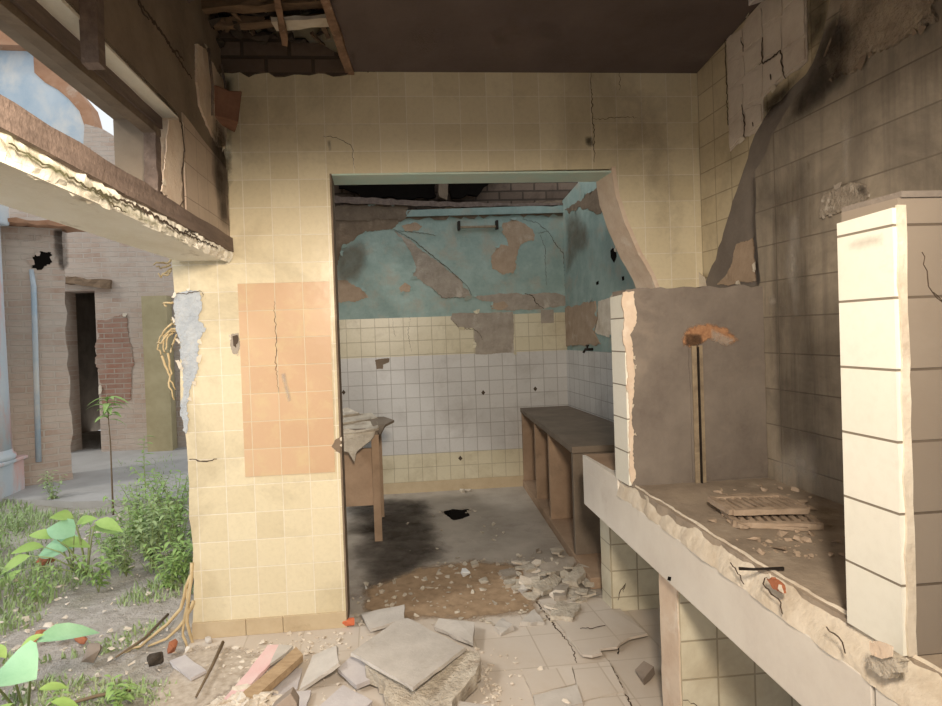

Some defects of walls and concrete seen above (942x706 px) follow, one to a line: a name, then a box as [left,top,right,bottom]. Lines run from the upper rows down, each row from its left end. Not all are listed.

crack [724,37,785,137]
peeling [726,0,809,152]
spalling [823,0,939,82]
crack [9,121,218,248]
crack [922,252,942,302]
spalling [95,313,134,408]
spalling [171,288,206,433]
spalling [334,166,942,706]
water stain [355,501,435,588]
crack [536,601,605,663]
crack [730,562,783,614]
crack [826,627,846,654]